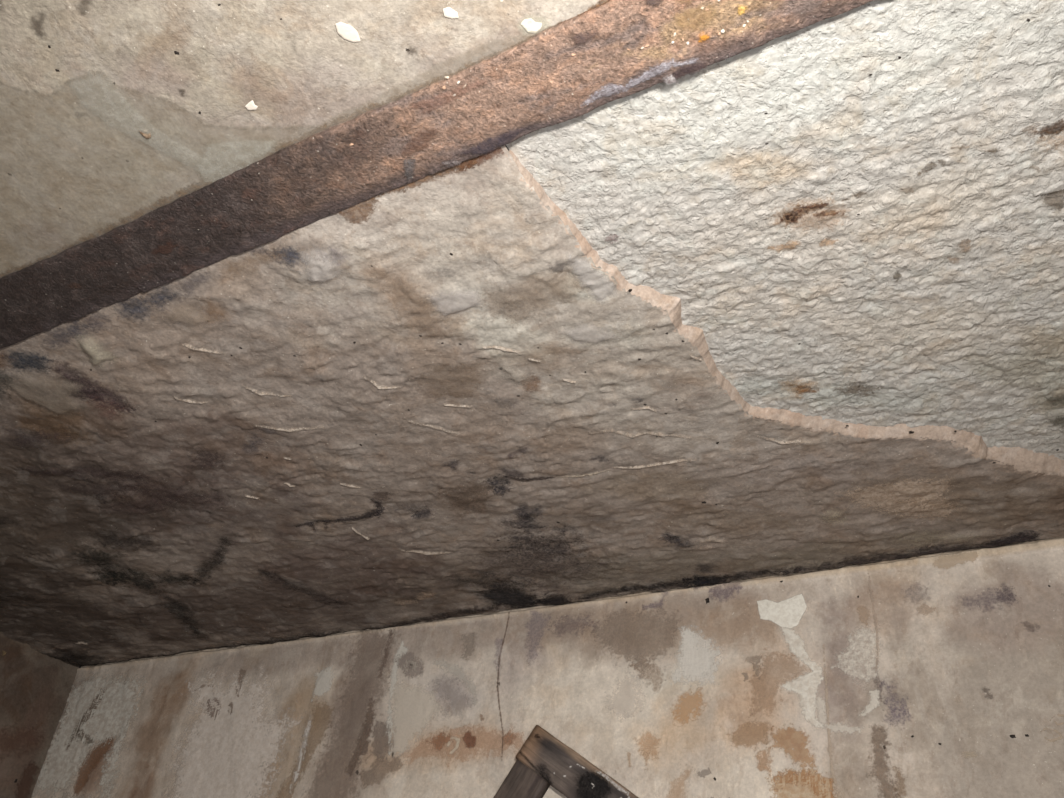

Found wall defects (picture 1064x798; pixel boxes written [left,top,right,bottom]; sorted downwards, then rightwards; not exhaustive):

rust [0,36,533,278]
rust [780,203,845,225]
mould [0,352,132,412]
damp [0,652,145,798]
damp [74,536,230,591]
damp [157,601,339,657]
damp [167,665,334,798]
crack [497,612,510,753]
damp [346,505,1037,798]
peeling [757,584,881,797]
damp [836,477,963,520]
peeling [934,552,978,569]